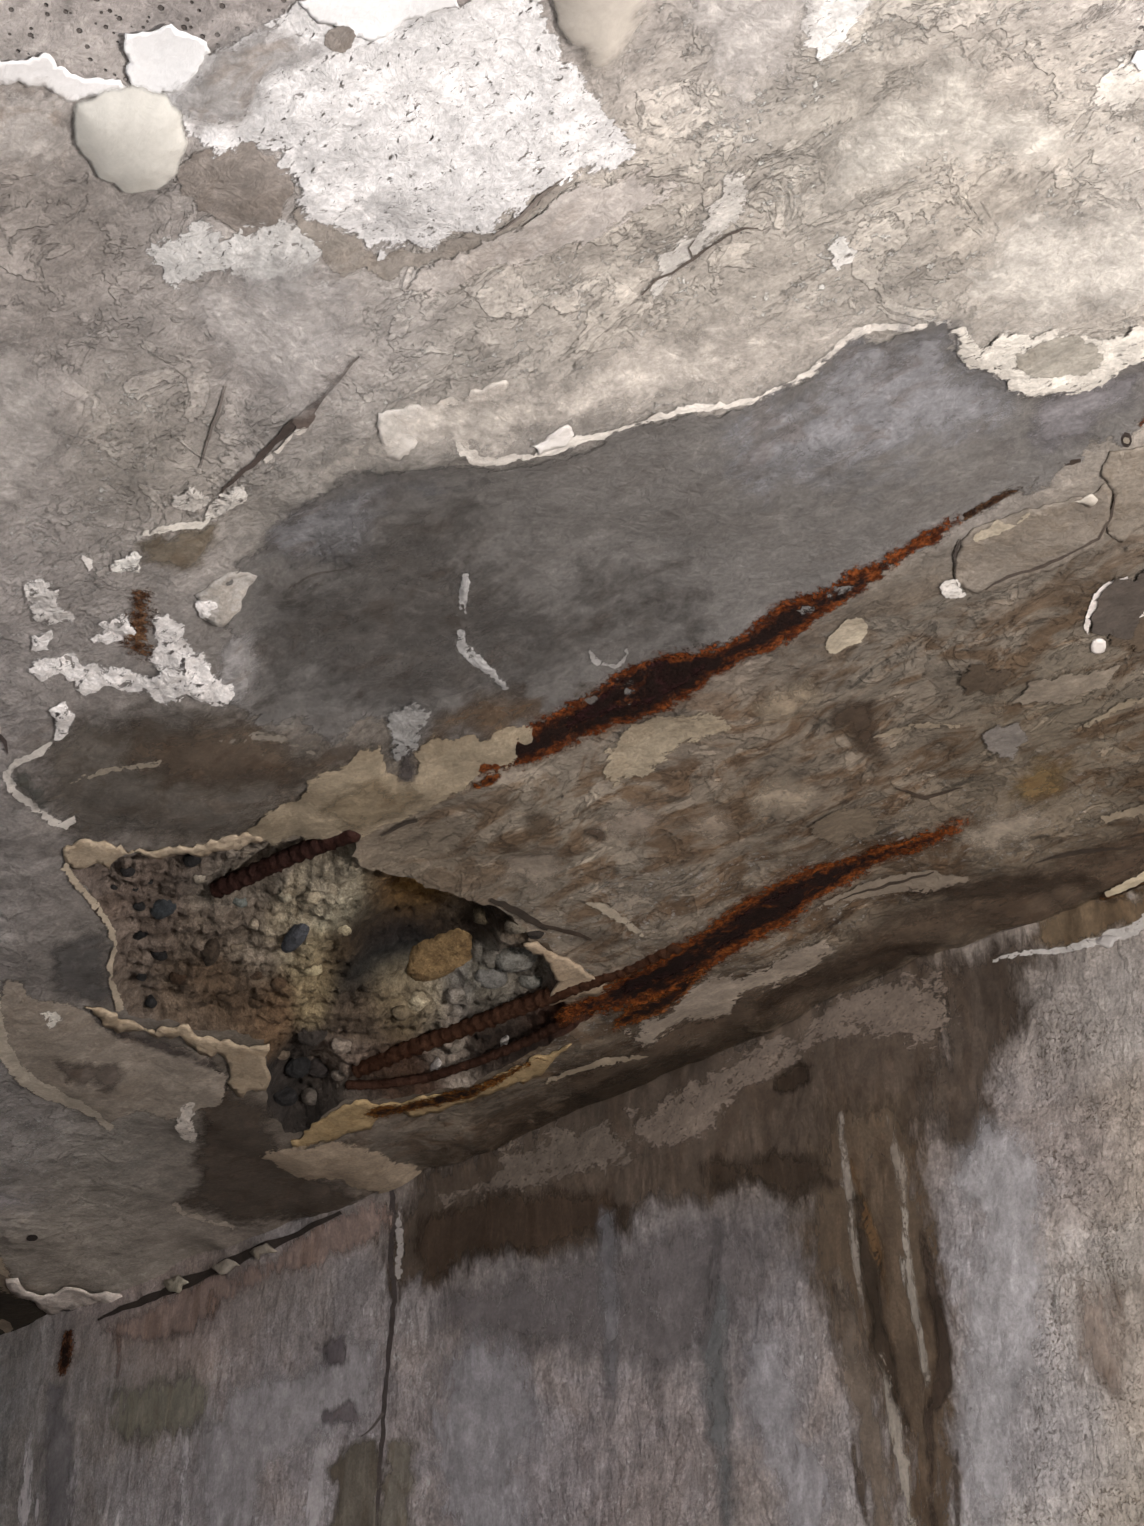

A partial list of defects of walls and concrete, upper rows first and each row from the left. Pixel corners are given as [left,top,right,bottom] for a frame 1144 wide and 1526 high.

flaking render [0,0,637,369]
flaking render [643,171,749,299]
flaking render [827,236,858,271]
flaking render [1090,50,1144,115]
spalling [0,320,1144,1194]
rust [474,487,1023,789]
damp [831,700,884,760]
rust [555,814,973,1032]
crack [98,1211,342,1321]
crack [361,1190,405,1526]
damp [377,825,1144,1526]